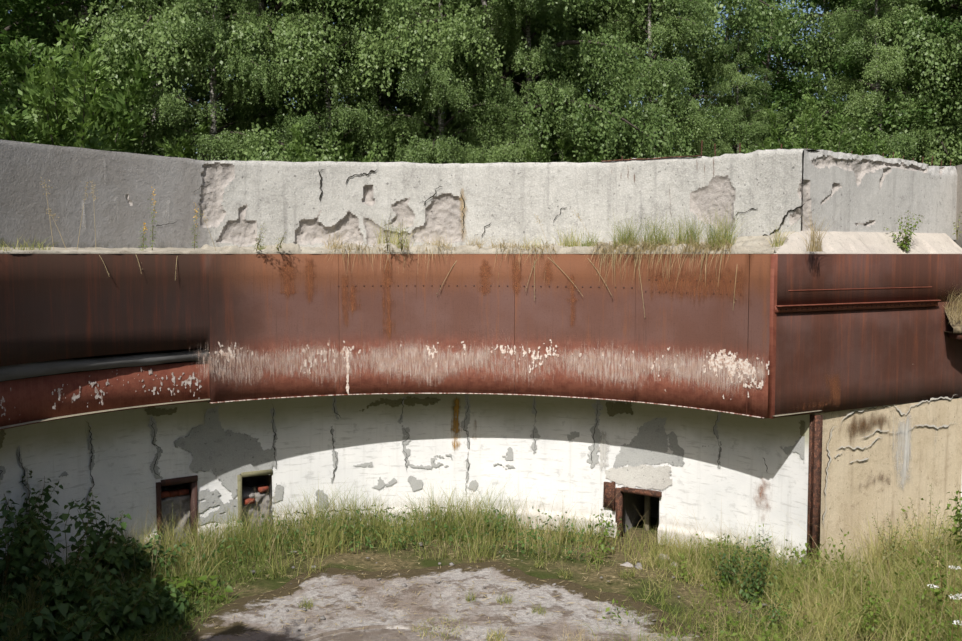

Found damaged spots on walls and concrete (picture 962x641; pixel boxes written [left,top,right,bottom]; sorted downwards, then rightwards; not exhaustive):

spalling [198,162,259,246]
spalling [293,185,463,246]
spalling [690,175,735,232]
rust [0,254,962,449]
peeling [174,405,275,525]
peeling [605,401,633,417]
peeling [613,417,685,469]
crack [822,394,958,524]